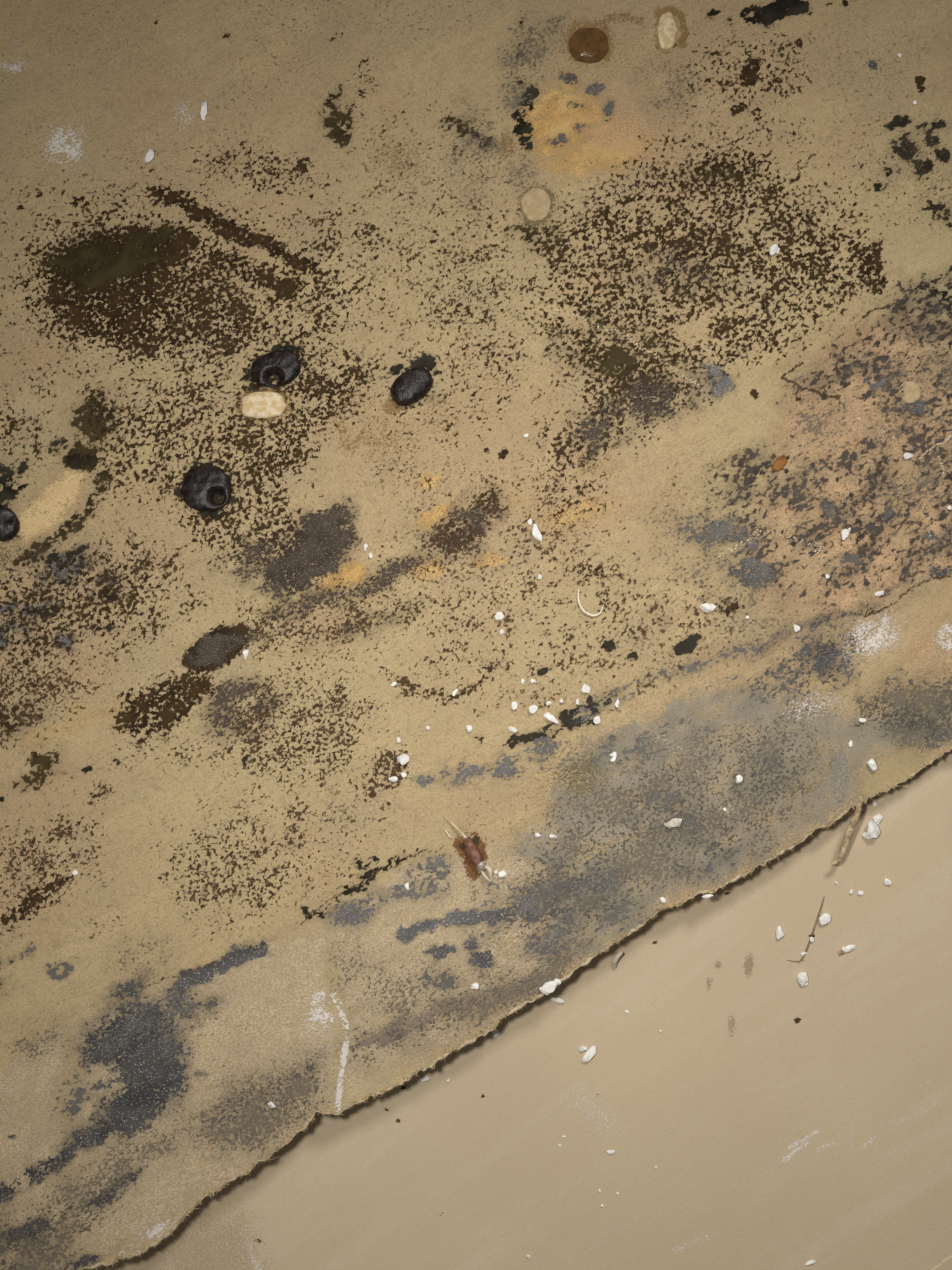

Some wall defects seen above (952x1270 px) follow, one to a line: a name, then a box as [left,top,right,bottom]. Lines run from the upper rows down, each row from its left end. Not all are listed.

water stain [740,0,812,33]
water stain [915,76,926,93]
water stain [4,178,56,214]
water stain [861,115,952,232]
water stain [0,766,115,970]
water stain [287,812,451,927]
water stain [0,926,334,1270]
peeling [0,811,565,1270]